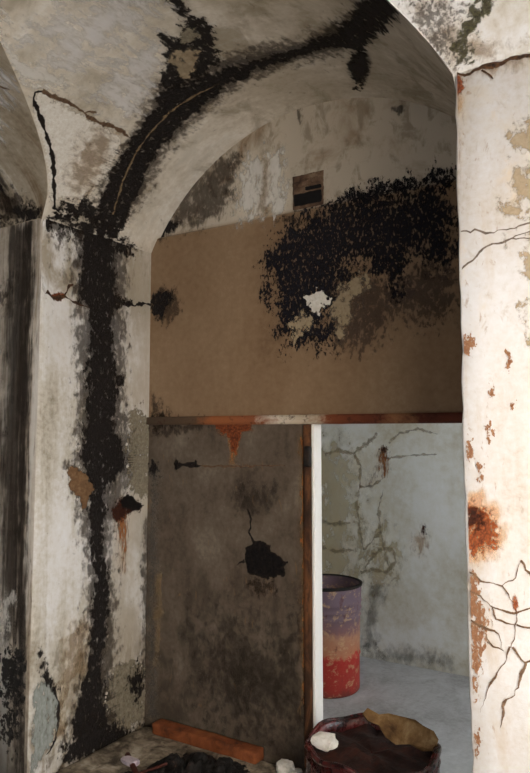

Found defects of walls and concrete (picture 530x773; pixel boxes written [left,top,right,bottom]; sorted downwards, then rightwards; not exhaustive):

leakage [409,0,493,69]
crack [33,89,130,206]
peeling [505,117,530,155]
peeling [498,167,530,219]
crack [461,222,530,269]
rust [174,424,285,470]
spalling [67,465,94,512]
rust [112,492,144,573]
rust [468,502,499,557]
leakage [0,591,27,762]
leakage [37,648,61,755]
crack [469,560,530,728]